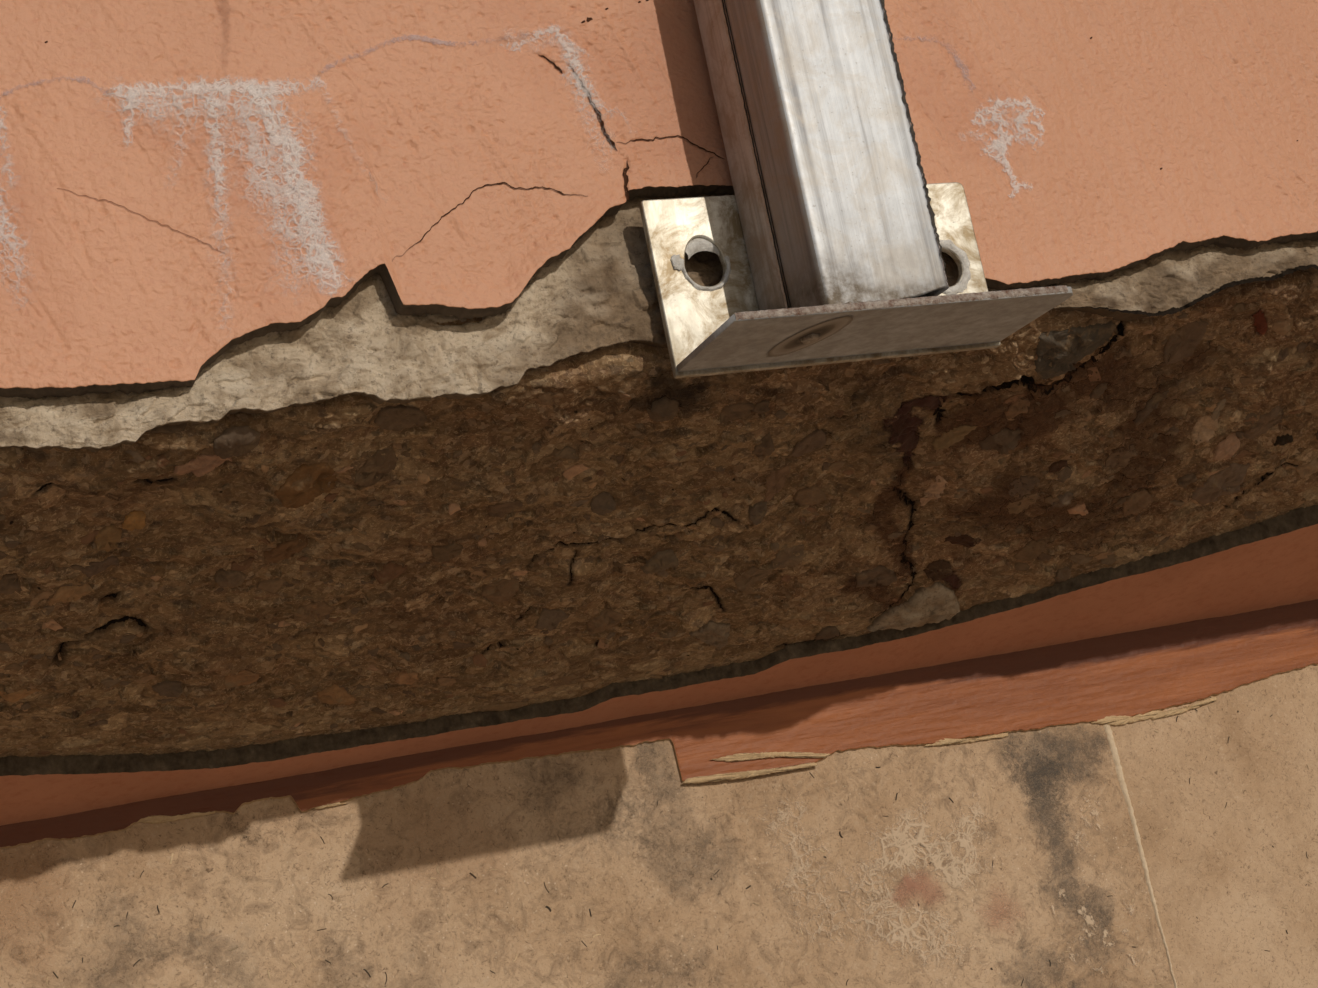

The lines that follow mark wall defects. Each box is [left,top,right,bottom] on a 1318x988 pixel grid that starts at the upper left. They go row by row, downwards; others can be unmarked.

crack [539,55,724,201]
crack [392,182,584,261]
crack [532,508,737,583]
spalling [0,194,1318,757]
crack [691,586,724,611]
crack [871,464,917,620]
leakage [1006,733,1134,973]